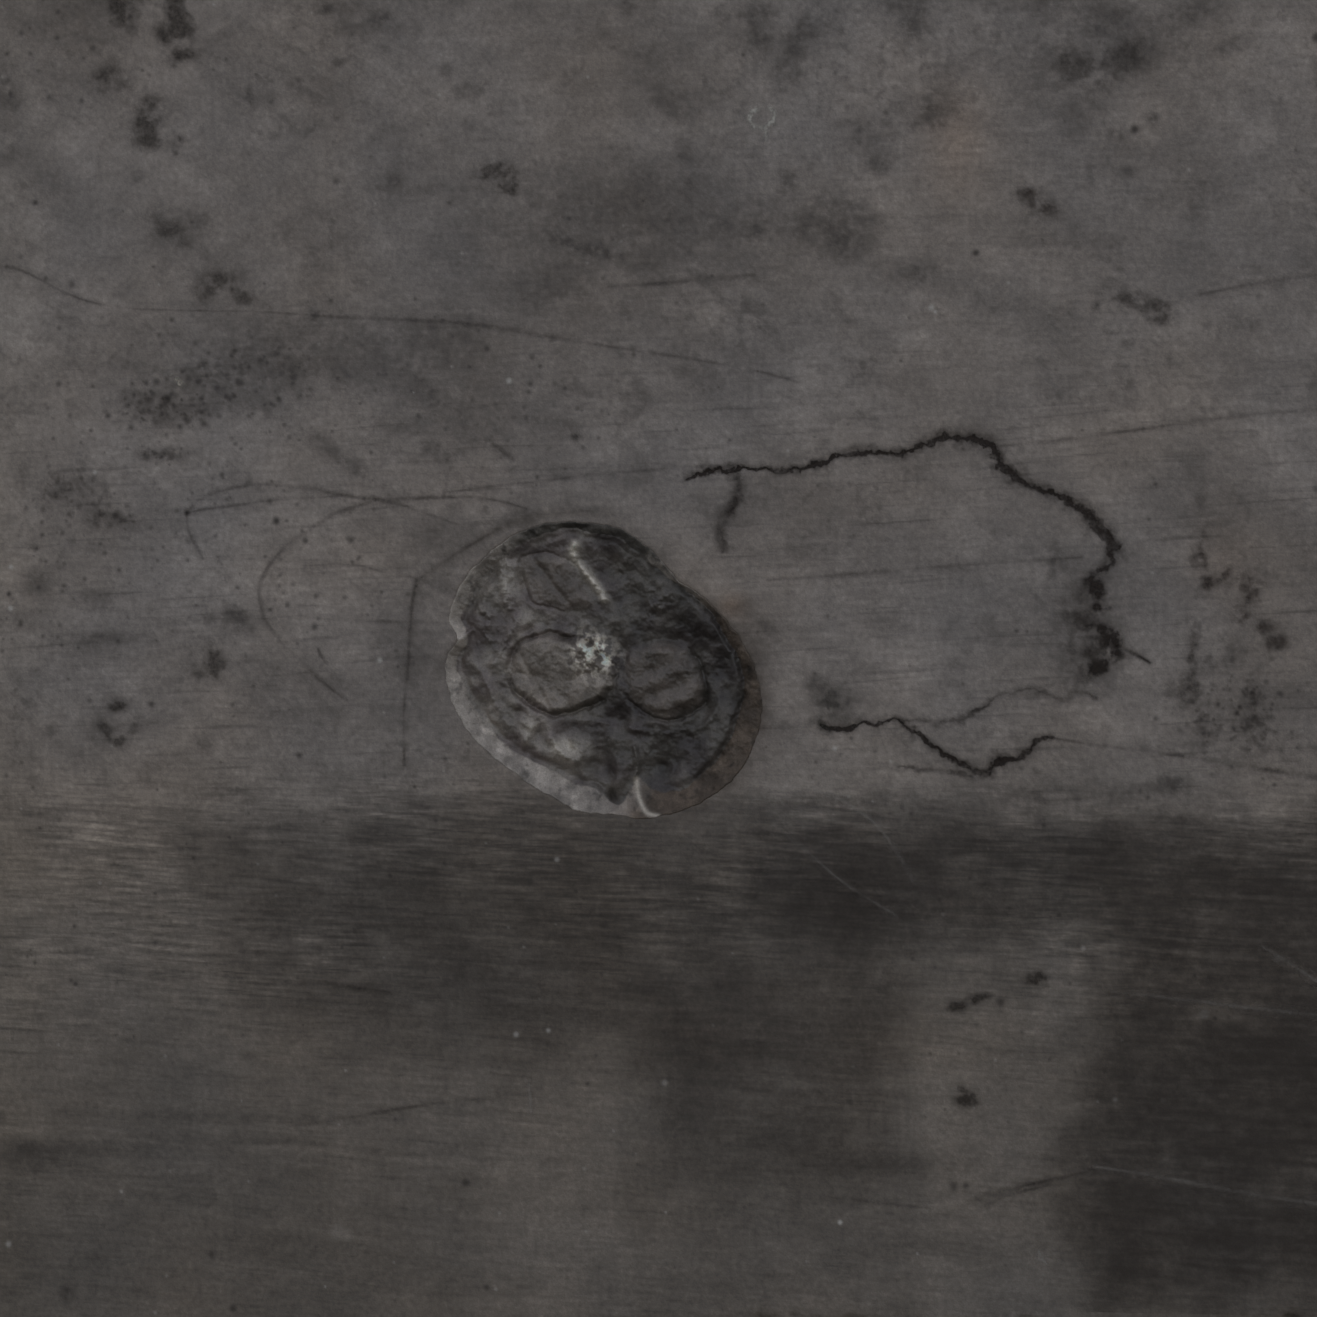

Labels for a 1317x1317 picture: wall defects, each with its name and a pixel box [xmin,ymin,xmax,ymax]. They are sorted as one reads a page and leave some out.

crack [685,431,1151,676]
crack [820,717,1053,777]
water stain [1090,846,1317,1283]